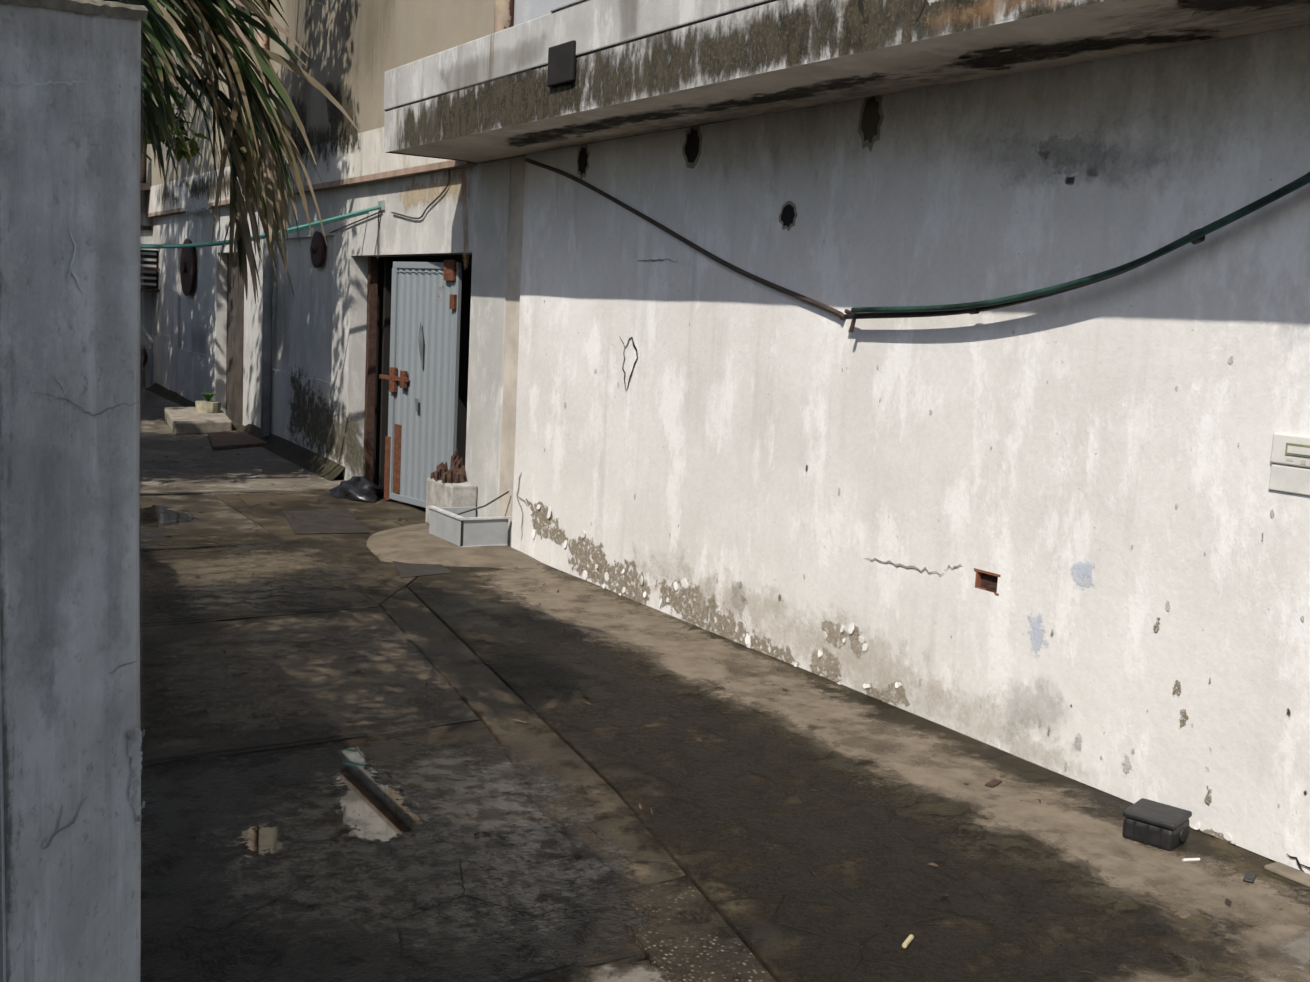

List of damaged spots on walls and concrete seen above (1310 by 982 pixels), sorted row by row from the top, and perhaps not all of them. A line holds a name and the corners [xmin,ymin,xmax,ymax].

leakage [398,0,1107,149]
leakage [281,82,359,168]
leakage [159,172,241,207]
flaking render [526,498,868,685]
flaking render [863,679,922,706]